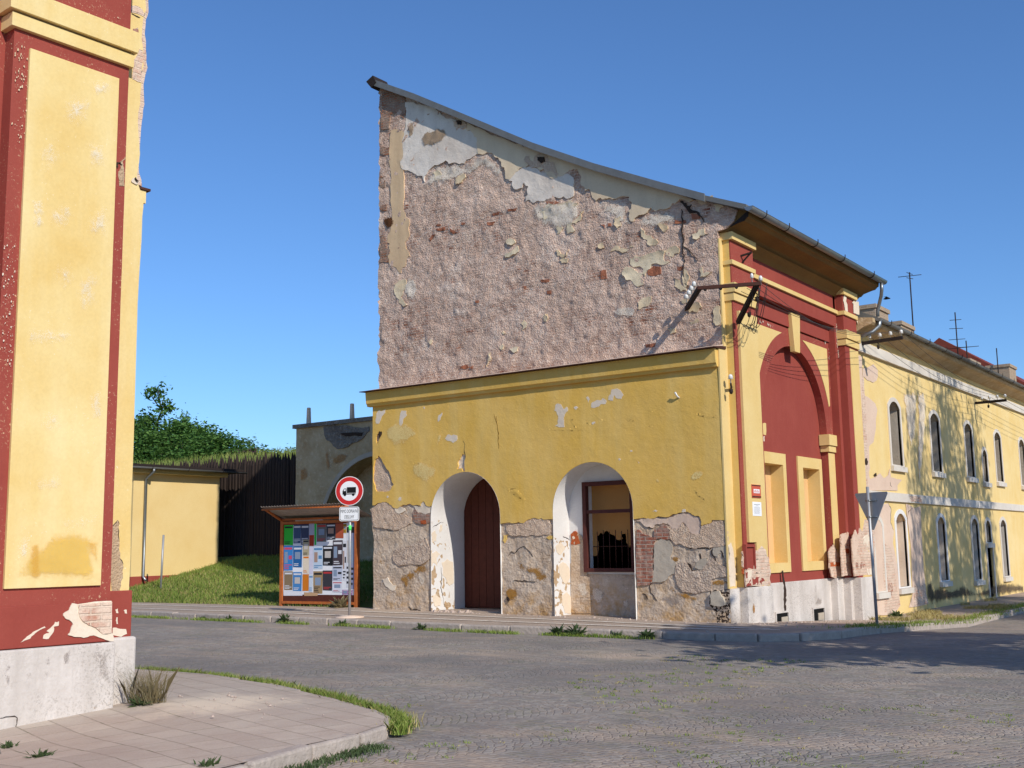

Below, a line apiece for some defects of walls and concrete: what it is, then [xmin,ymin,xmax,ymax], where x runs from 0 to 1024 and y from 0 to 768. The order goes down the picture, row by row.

flaking render [377,88,738,389]
crack [680,198,704,287]
peeling [554,389,623,427]
flaking render [22,520,127,642]
flaking render [370,457,454,611]
flaking render [501,518,591,616]
flaking render [634,509,771,623]
flaking render [828,355,929,615]